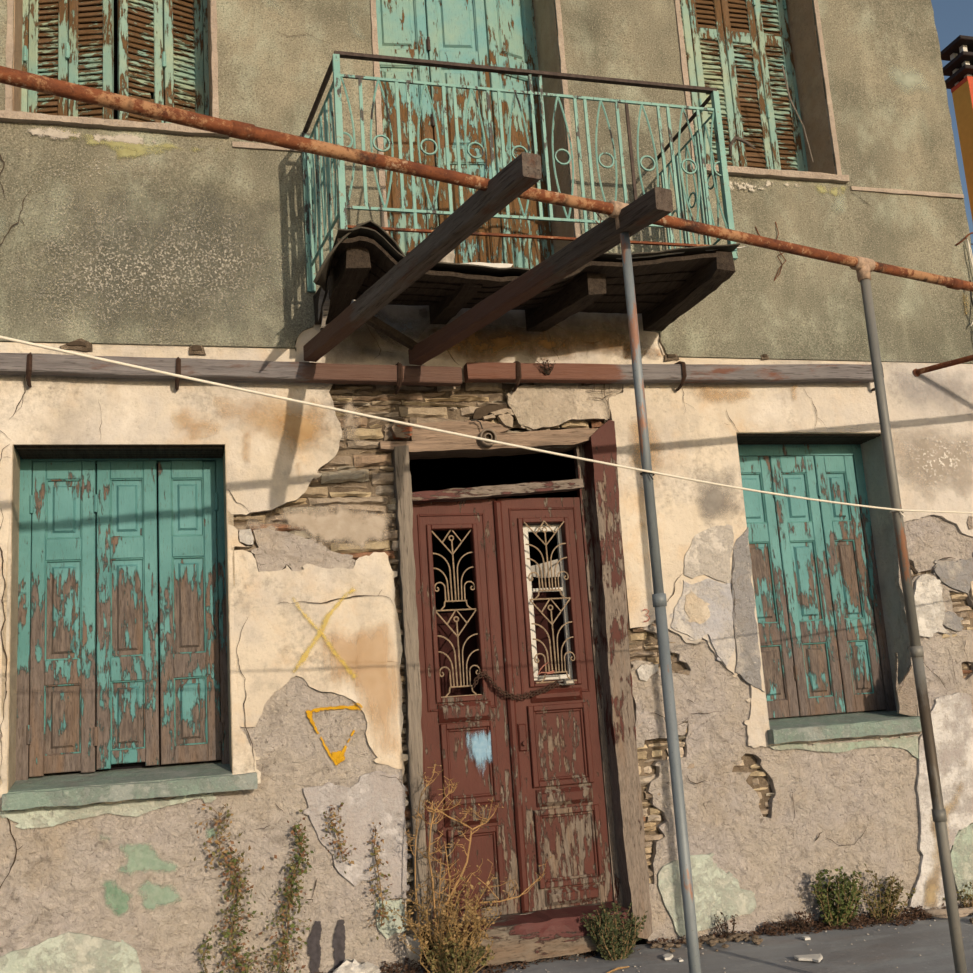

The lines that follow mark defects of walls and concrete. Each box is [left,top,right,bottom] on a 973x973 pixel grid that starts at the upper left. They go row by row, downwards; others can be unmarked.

crack [0,154,34,245]
flaking render [234,382,623,585]
crack [0,818,21,888]
spalling [0,599,423,973]
spalling [628,515,973,944]